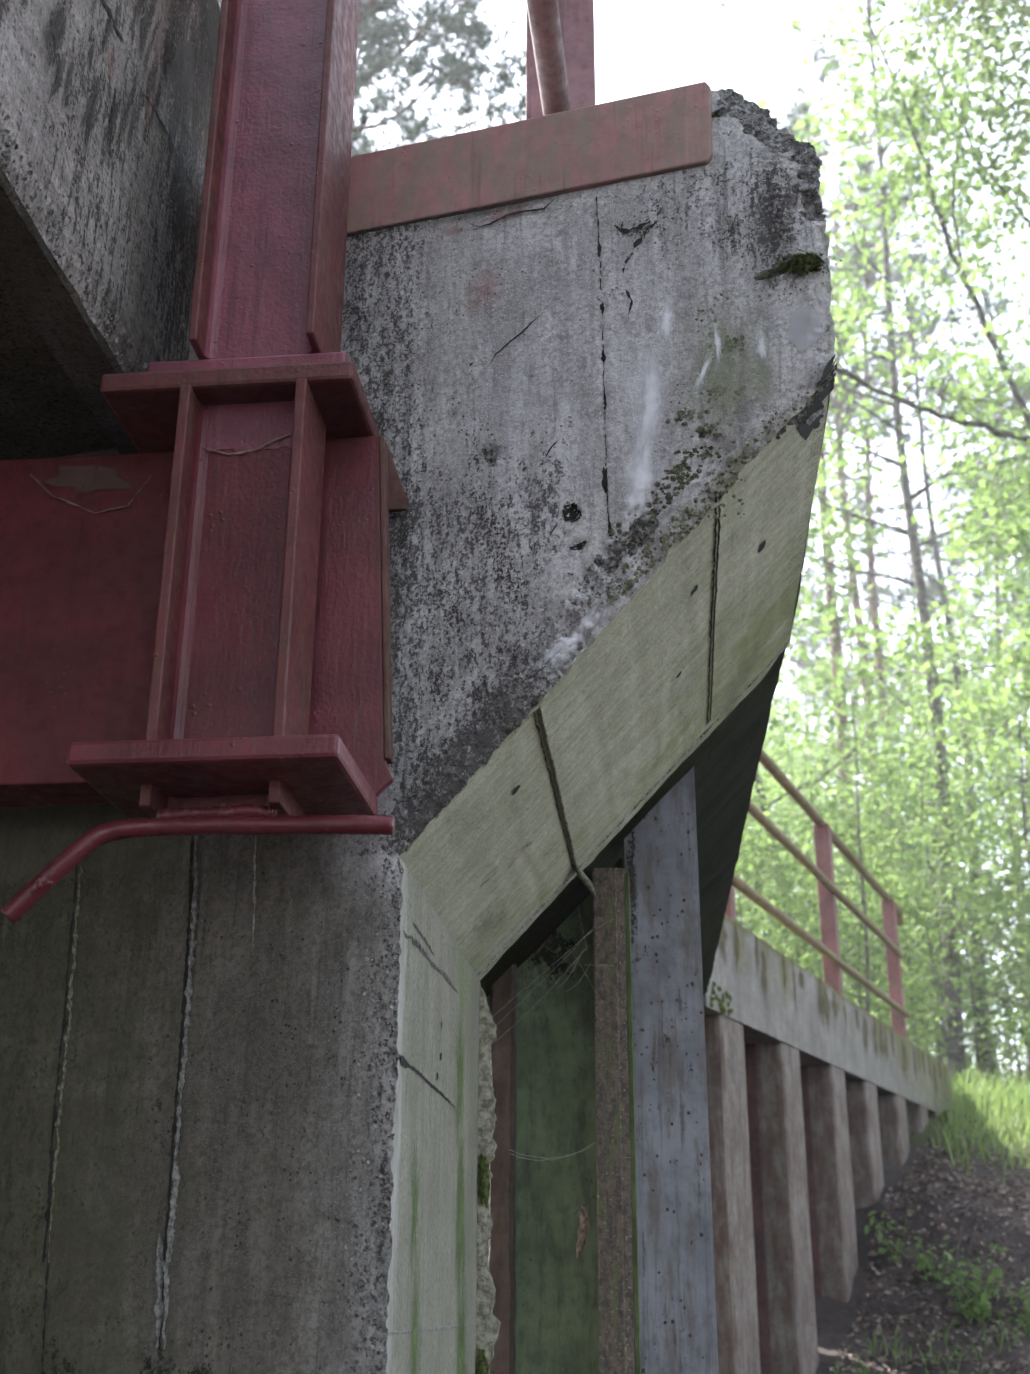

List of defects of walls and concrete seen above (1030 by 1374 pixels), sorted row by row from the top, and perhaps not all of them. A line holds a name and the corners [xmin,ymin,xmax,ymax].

water stain [0,0,28,34]
water stain [41,0,194,194]
spalling [712,88,827,221]
crack [347,186,668,534]